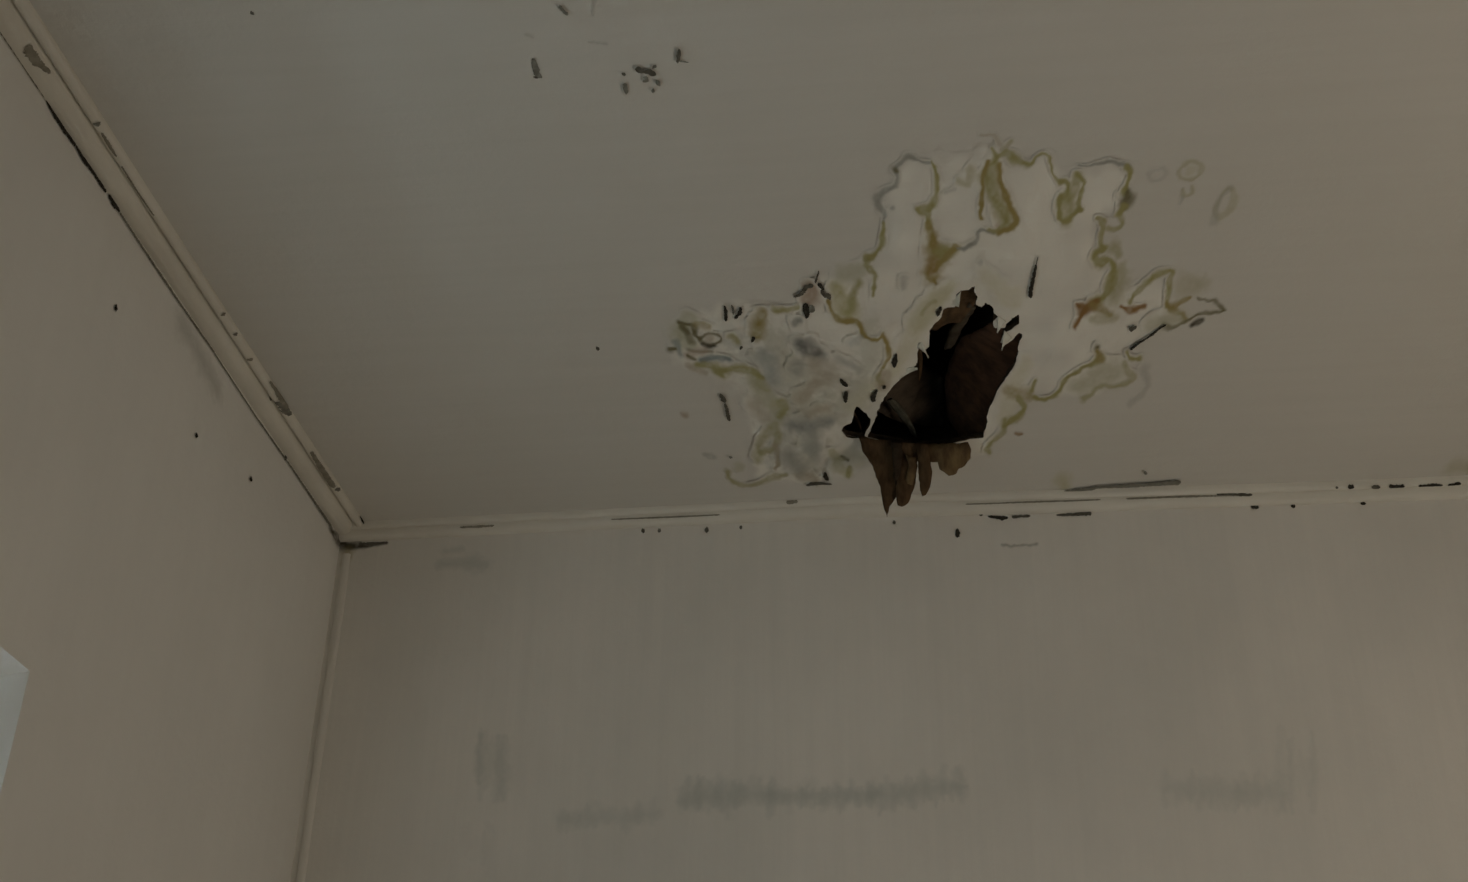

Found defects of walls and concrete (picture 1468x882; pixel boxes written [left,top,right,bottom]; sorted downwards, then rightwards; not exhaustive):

spalling [844,302,1019,440]
water stain [660,131,1229,490]
spalling [1336,482,1461,505]